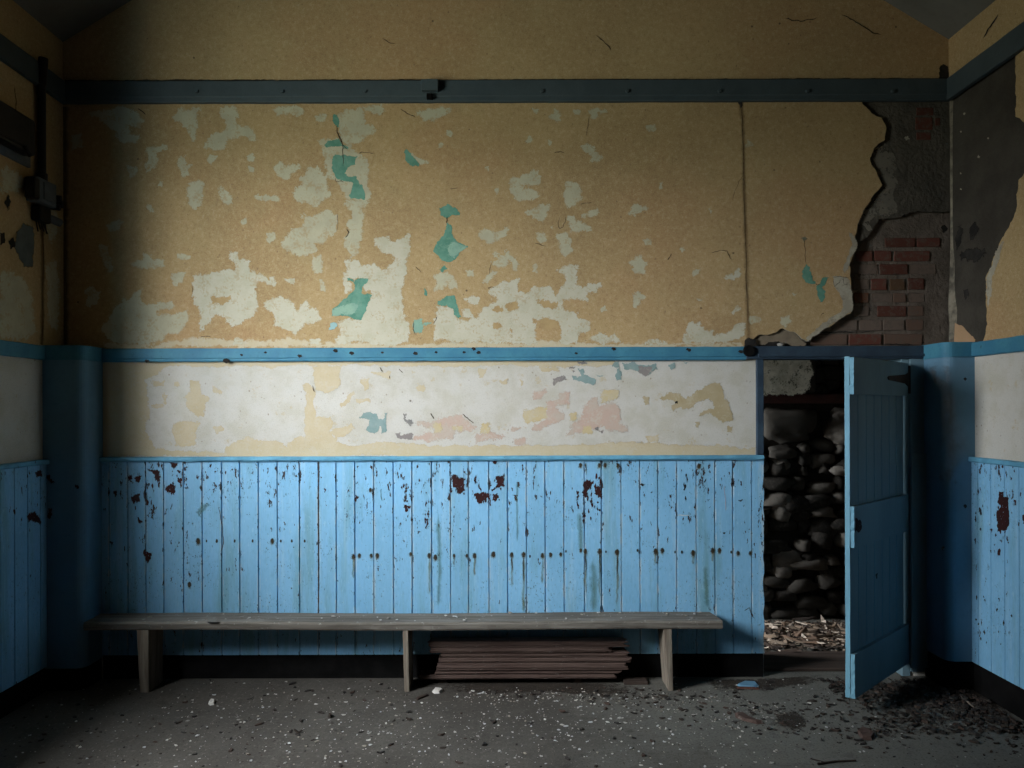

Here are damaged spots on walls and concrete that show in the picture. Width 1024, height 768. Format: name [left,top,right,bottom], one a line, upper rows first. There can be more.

peeling [89,105,168,187]
spalling [101,56,1024,349]
crack [712,102,757,346]
peeling [312,365,391,407]
peeling [475,361,587,446]
peeling [638,366,652,376]
peeling [103,447,233,505]
peeling [450,461,520,506]
peeling [576,464,602,524]
corrosion [510,550,567,605]
corrosion [580,548,619,597]